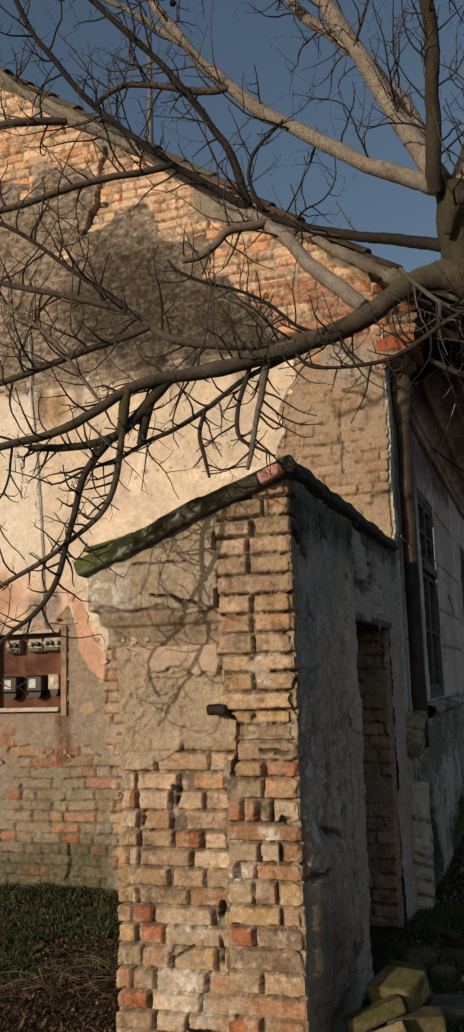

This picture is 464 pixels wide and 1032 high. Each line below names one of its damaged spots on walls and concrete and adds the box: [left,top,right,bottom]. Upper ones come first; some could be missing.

flaking render [0,87,354,336]
flaking render [296,237,379,301]
spalling [70,596,221,683]
crack [130,558,186,566]
crack [148,593,198,609]
flaking render [280,324,392,733]
flaking render [0,748,119,894]